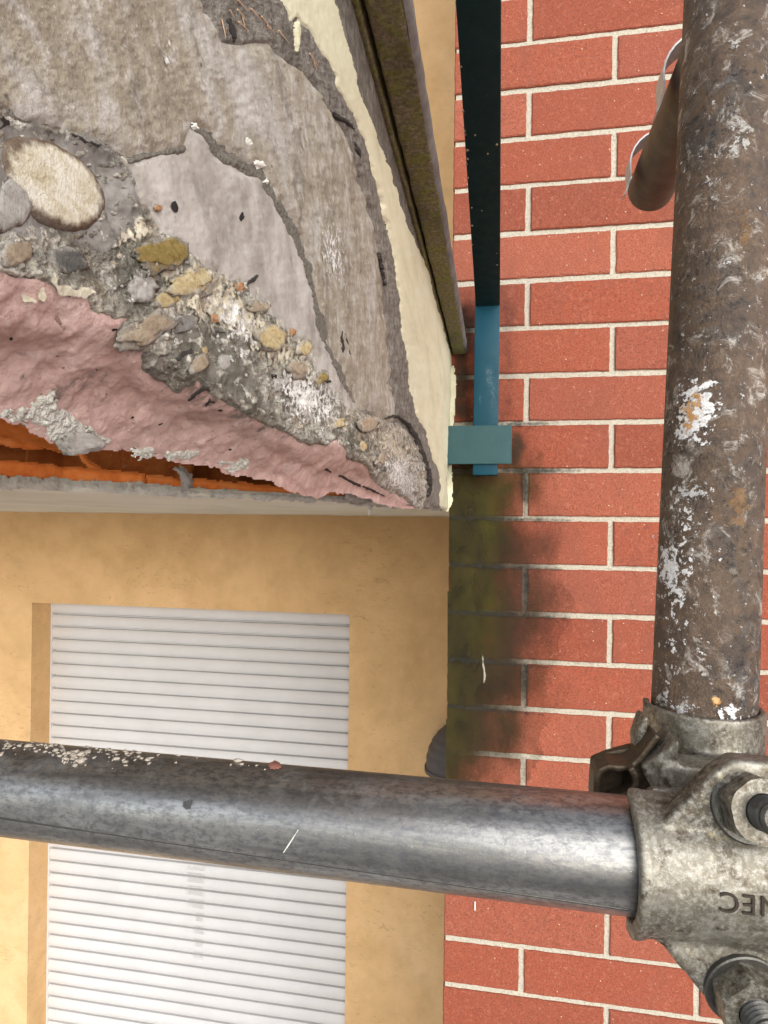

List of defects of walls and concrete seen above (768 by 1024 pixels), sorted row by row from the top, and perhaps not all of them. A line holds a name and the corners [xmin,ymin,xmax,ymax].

spalling [0,0,442,515]
water stain [448,656,532,692]